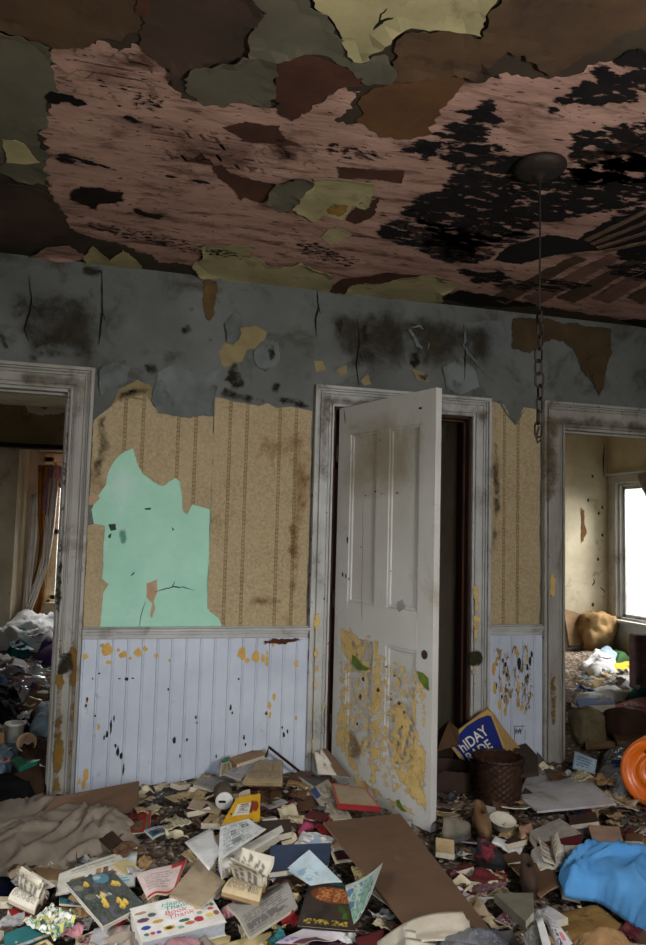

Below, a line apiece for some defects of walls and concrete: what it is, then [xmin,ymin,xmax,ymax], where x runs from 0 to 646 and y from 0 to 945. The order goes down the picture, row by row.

flaking render [2,0,646,320]
water stain [375,99,646,394]
crack [24,276,37,341]
crack [98,277,106,342]
water stain [200,279,217,320]
peeling [219,326,280,372]
water stain [336,315,488,380]
water stain [222,364,252,401]
flaking render [89,448,222,627]
water stain [55,545,63,611]
peeling [492,644,533,716]
peeling [336,628,429,815]